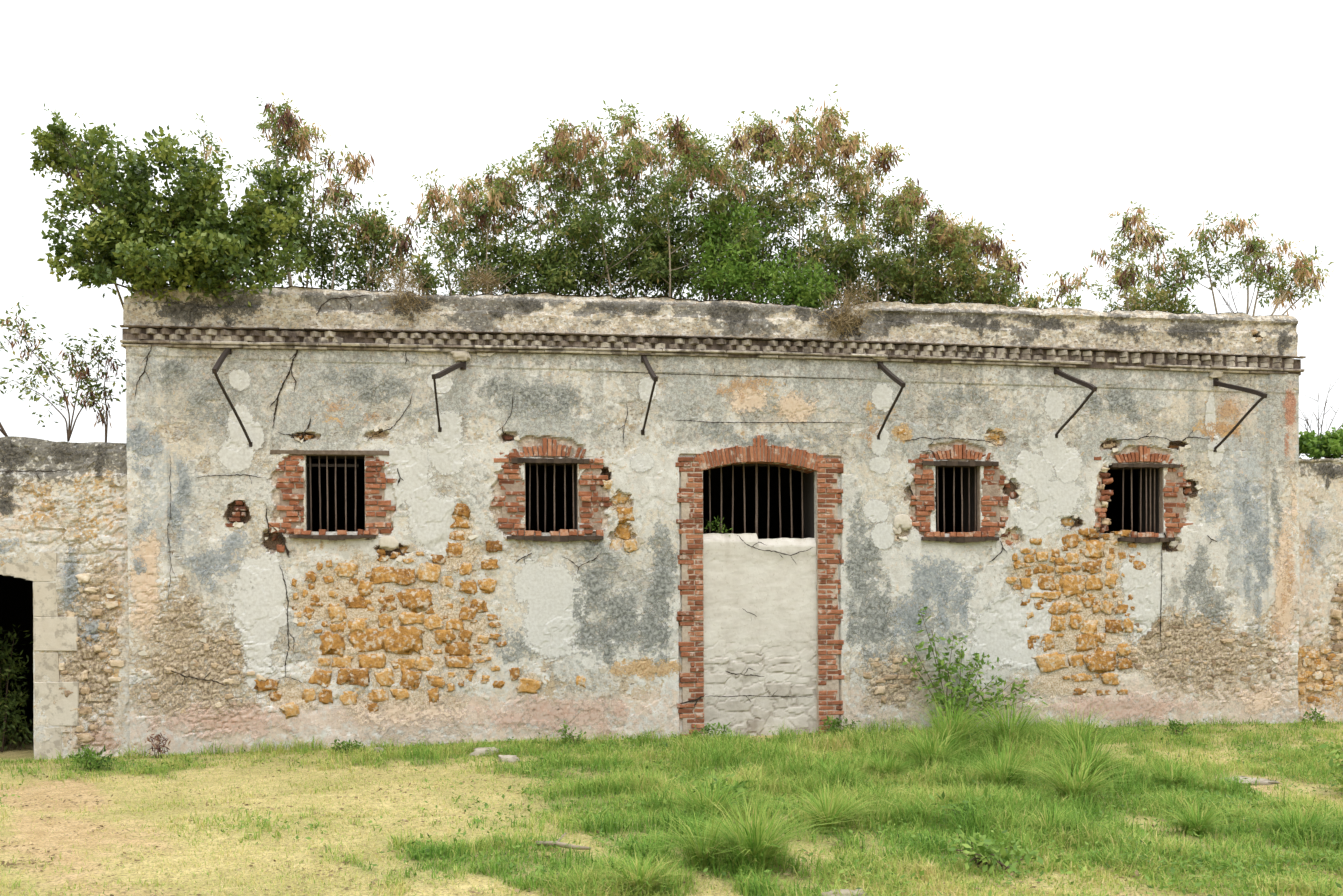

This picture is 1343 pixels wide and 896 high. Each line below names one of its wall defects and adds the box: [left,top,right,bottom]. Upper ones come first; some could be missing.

damp [0,440,109,515]
damp [126,421,163,480]
damp [128,457,251,641]
crack [172,671,226,687]
crack [167,455,300,682]
spalling [223,498,251,528]
crack [270,350,311,437]
spalling [53,503,547,756]
damp [572,519,678,669]
damp [842,499,980,662]
spalling [993,440,1343,715]
damp [1180,468,1325,647]